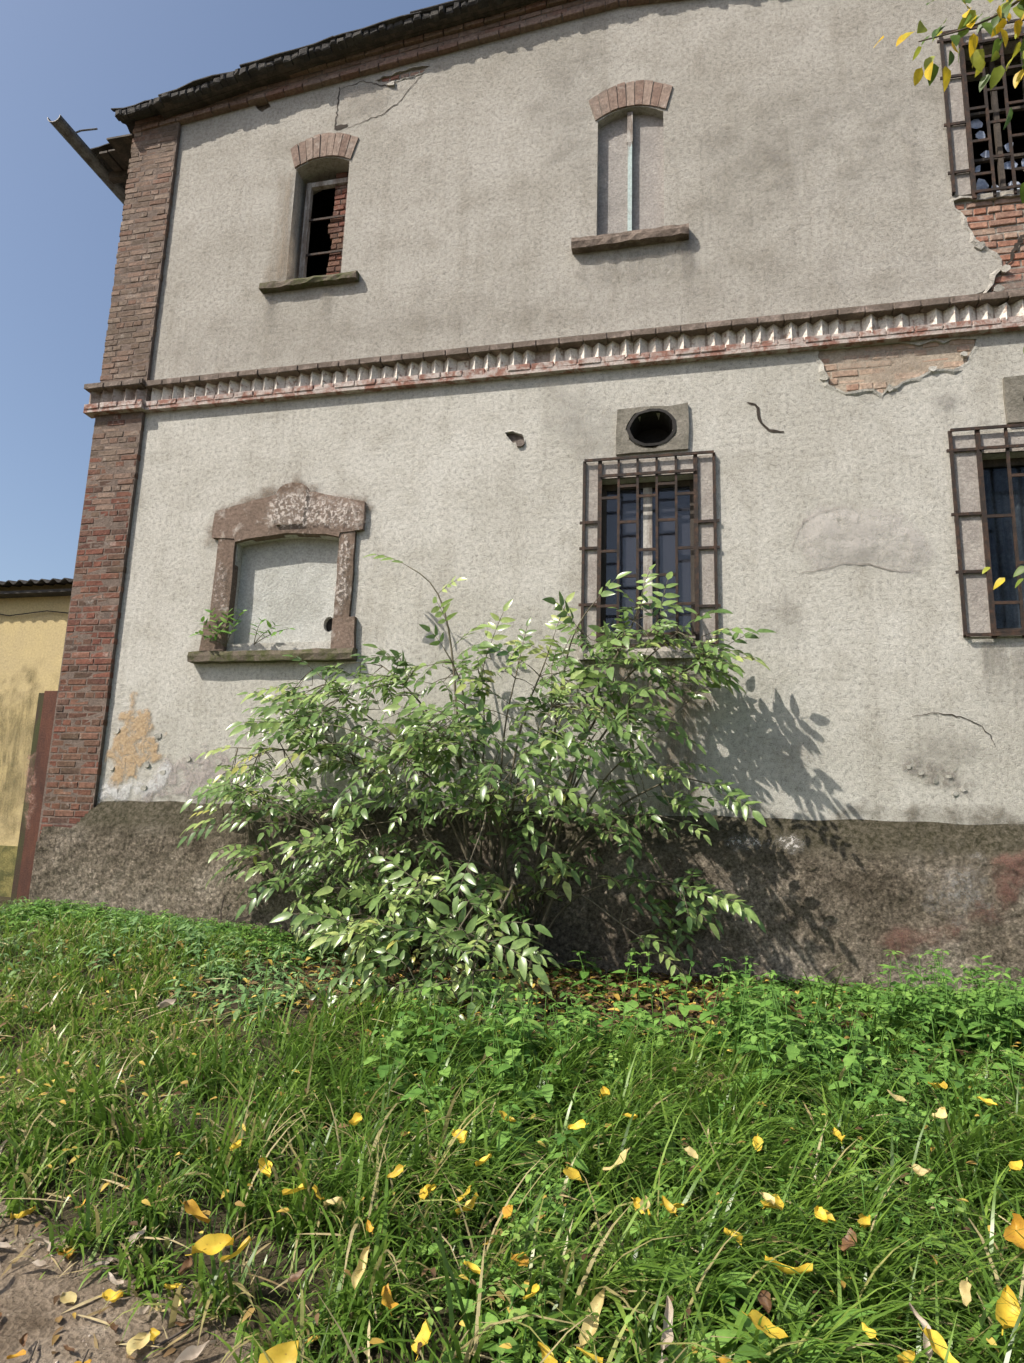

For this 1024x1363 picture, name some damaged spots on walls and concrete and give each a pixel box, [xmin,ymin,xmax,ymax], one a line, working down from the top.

crack [334,73,423,130]
spalling [949,192,1024,294]
spalling [815,336,979,399]
spalling [504,430,526,447]
crack [747,402,784,433]
peeling [99,693,261,804]
crack [915,713,996,747]